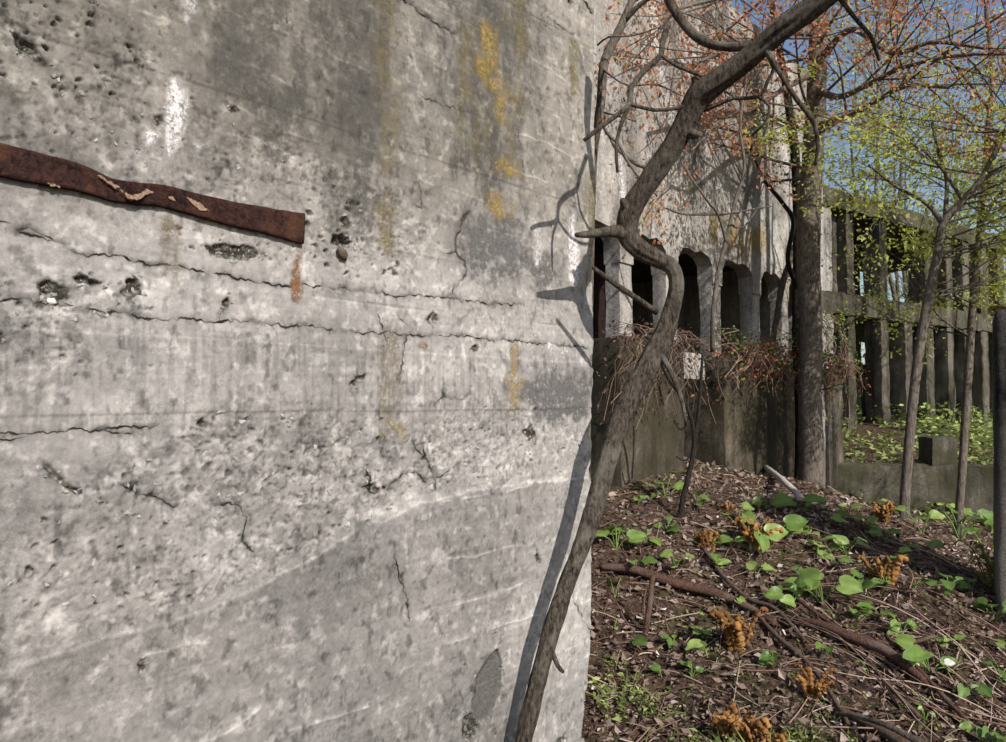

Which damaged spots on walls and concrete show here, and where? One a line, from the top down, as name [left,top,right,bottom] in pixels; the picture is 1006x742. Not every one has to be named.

leakage [145,78,188,156]
leakage [450,0,541,207]
spalling [205,238,269,263]
crack [0,211,586,379]
corrosion [291,259,301,301]
leakage [469,209,591,287]
crack [0,425,156,441]
crack [393,544,410,620]